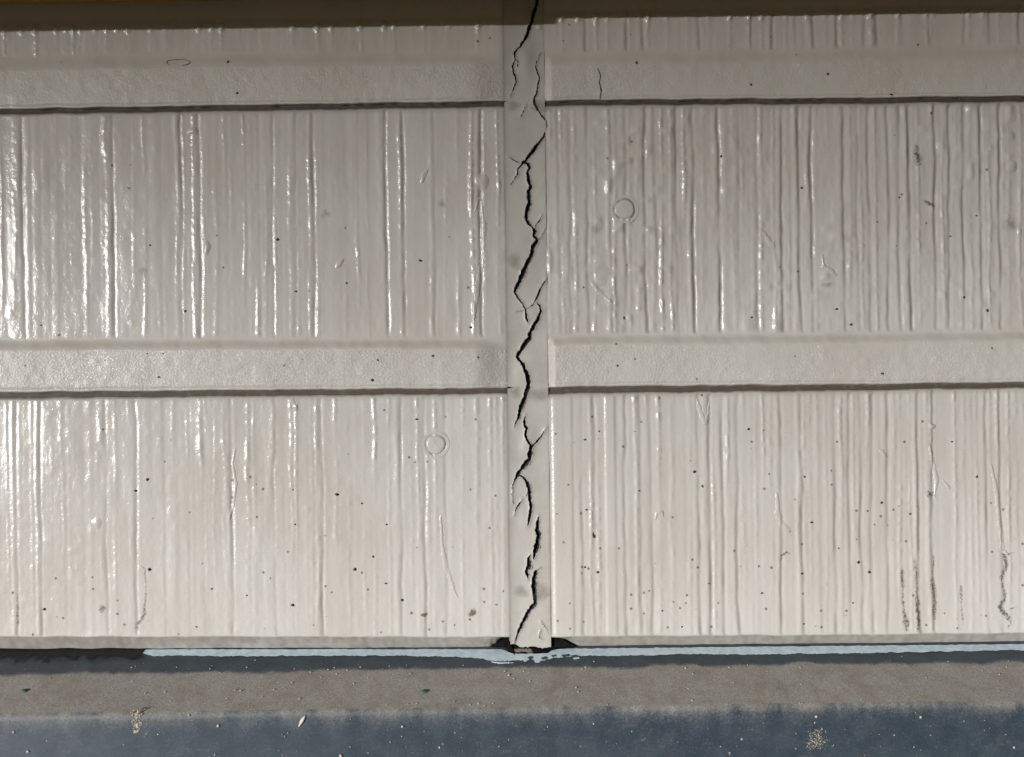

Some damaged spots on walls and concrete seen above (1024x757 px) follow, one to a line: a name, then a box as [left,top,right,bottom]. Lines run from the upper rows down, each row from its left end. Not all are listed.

crack [510,0,547,641]